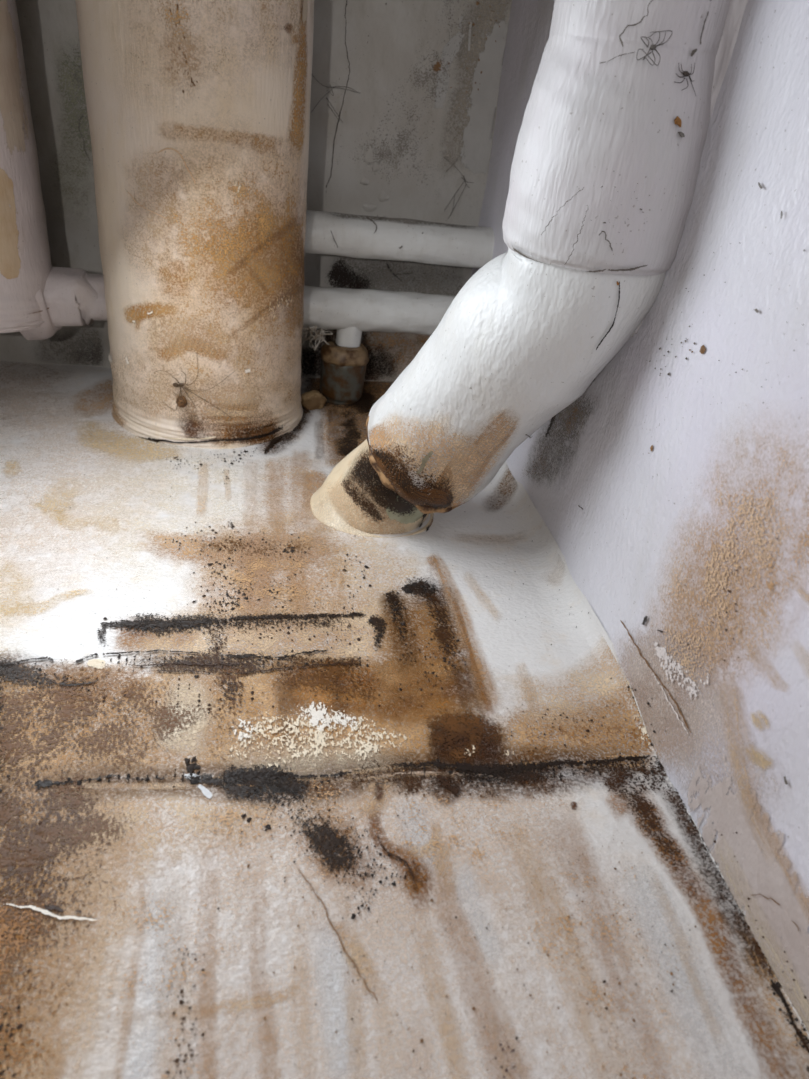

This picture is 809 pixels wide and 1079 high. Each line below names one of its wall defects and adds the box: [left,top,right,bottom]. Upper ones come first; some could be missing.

rust [157,0,199,98]
rust [261,0,307,150]
crack [326,0,350,188]
rust [108,134,304,445]
rust [0,378,809,1079]